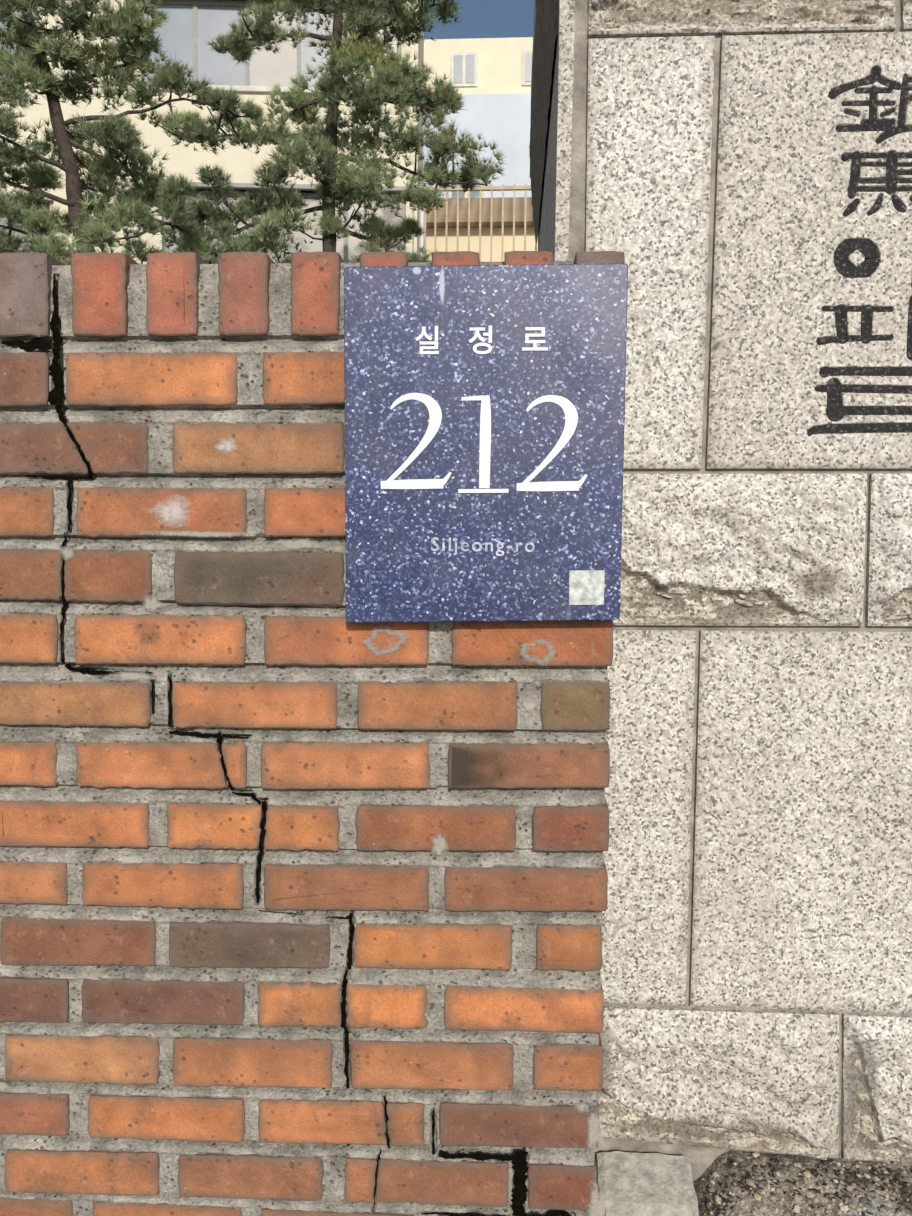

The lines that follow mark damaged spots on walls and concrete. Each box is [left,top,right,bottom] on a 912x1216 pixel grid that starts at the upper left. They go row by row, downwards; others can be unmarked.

spalling [599,0,885,29]
crack [0,274,355,1088]
crack [372,1096,390,1213]
crack [429,1110,437,1154]
crack [421,1208,482,1216]
crack [511,1151,571,1216]